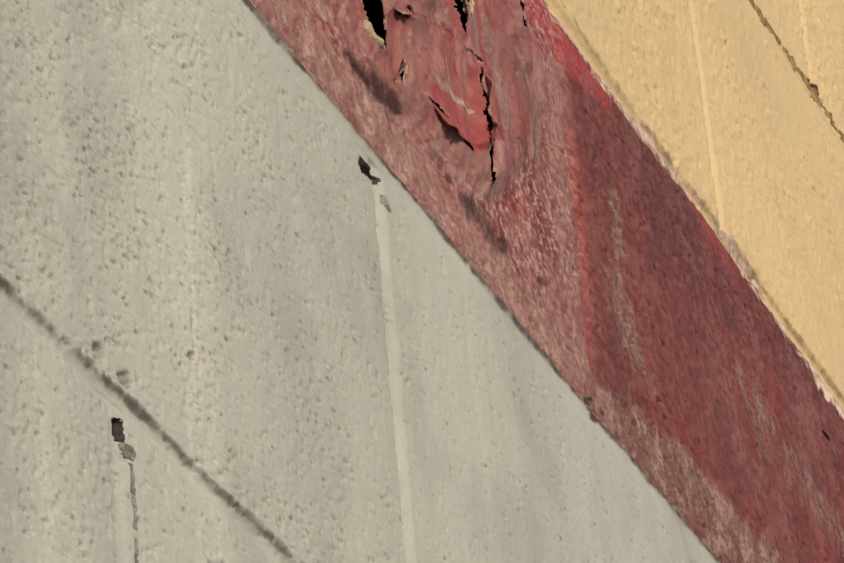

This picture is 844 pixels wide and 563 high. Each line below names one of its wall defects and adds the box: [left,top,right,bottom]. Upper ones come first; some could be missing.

peeling [320,0,554,210]
peeling [543,0,703,216]
peeling [715,220,766,299]
crack [128,462,140,563]